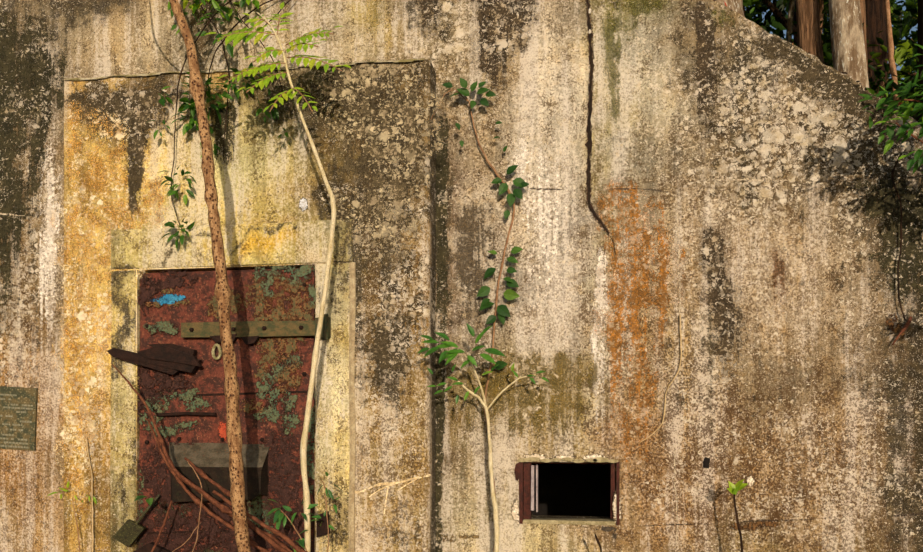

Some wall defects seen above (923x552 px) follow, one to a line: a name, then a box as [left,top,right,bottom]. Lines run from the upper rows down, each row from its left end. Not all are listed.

leakage [0,10,183,348]
leakage [266,60,495,552]
leakage [415,0,443,39]
leakage [469,0,539,99]
crack [585,0,615,251]
corrosion [595,179,686,475]